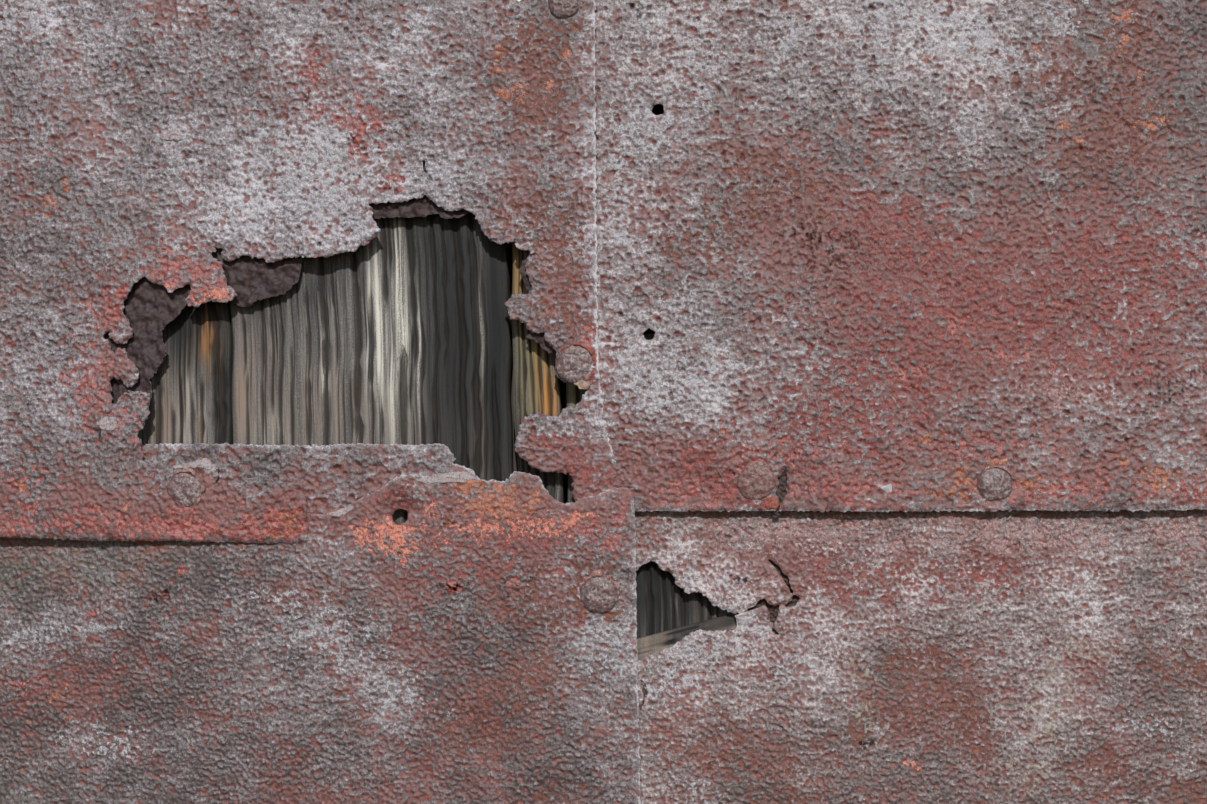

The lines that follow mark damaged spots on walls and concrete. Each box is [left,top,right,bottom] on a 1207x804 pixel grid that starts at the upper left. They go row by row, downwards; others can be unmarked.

rust [485,0,597,385]
rust [530,0,1207,614]
rust [0,446,307,542]
rust [349,479,629,784]
crack [731,559,800,635]
rust [1119,630,1207,707]
rust [1046,739,1207,804]